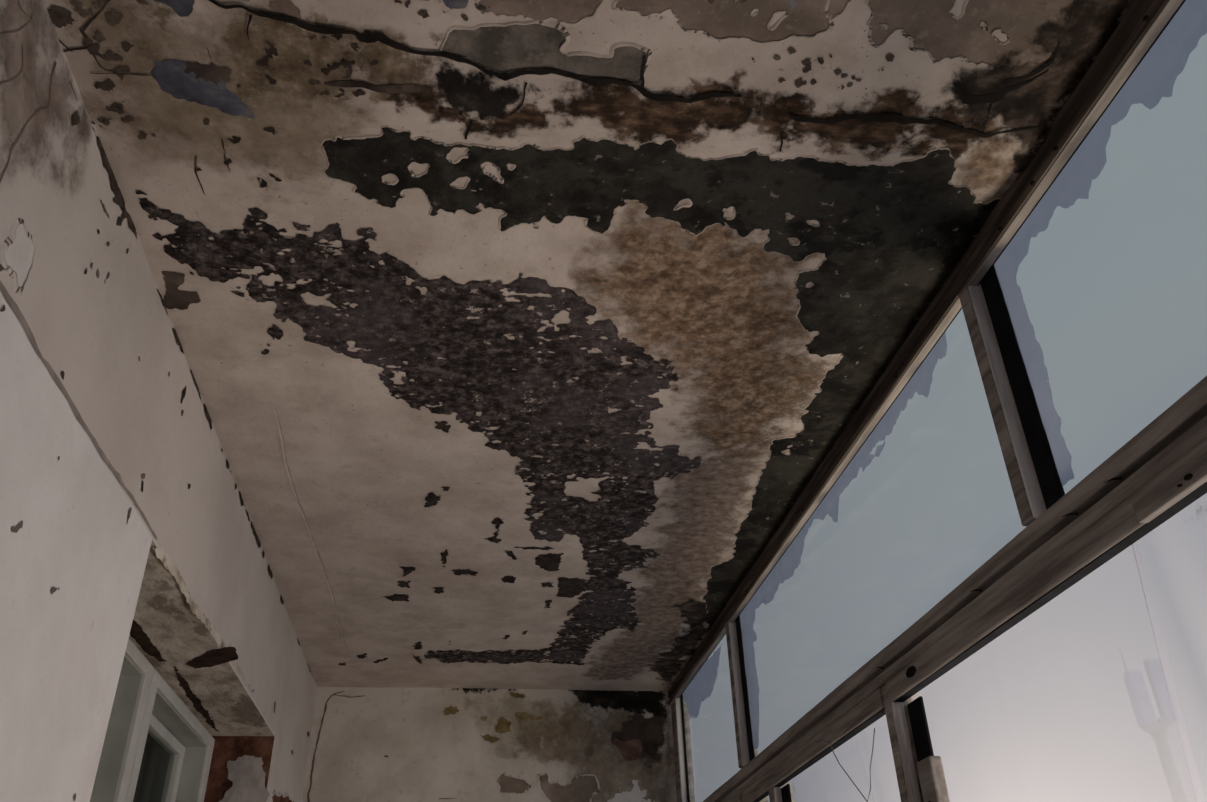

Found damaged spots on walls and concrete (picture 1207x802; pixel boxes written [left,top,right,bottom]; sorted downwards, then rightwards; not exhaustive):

damp [0,0,72,167]
flaking render [48,0,156,140]
flaking render [184,62,241,88]
crack [464,120,473,140]
crack [208,0,741,116]
peeling [439,0,1077,92]
crack [780,41,1060,152]
damp [71,0,1133,685]
spalling [153,547,254,693]
damp [480,717,511,743]
peeling [496,772,655,802]
damp [515,690,674,802]